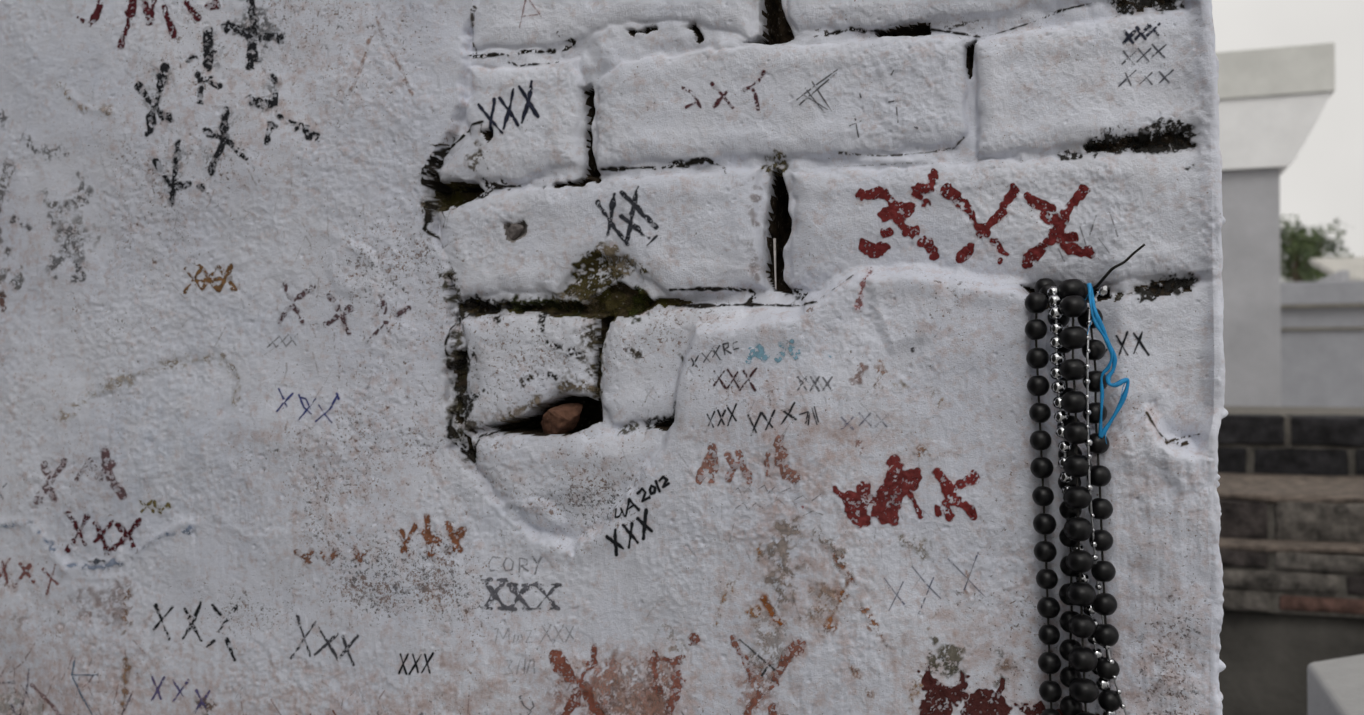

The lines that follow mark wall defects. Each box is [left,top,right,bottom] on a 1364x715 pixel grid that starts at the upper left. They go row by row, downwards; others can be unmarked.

mould [1111,0,1184,17]
mould [1057,117,1197,160]
damp [583,242,653,324]
flaking render [429,0,1212,546]
damp [1110,272,1198,303]
damp [455,289,598,362]
damp [451,352,600,460]
damp [619,402,676,434]